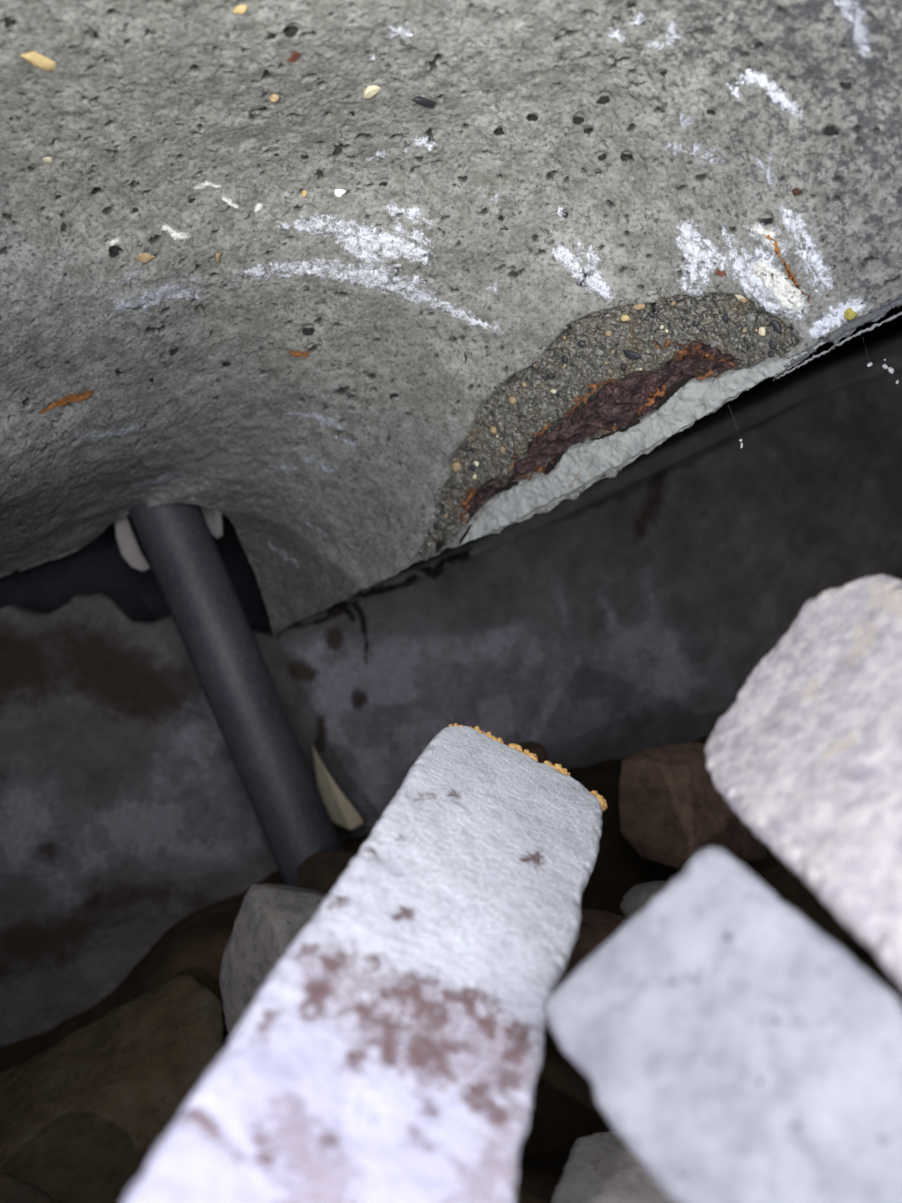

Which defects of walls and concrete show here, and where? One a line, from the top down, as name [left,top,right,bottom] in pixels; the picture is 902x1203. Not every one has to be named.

efflorescence [675,207,867,339]
spalling [406,284,902,561]